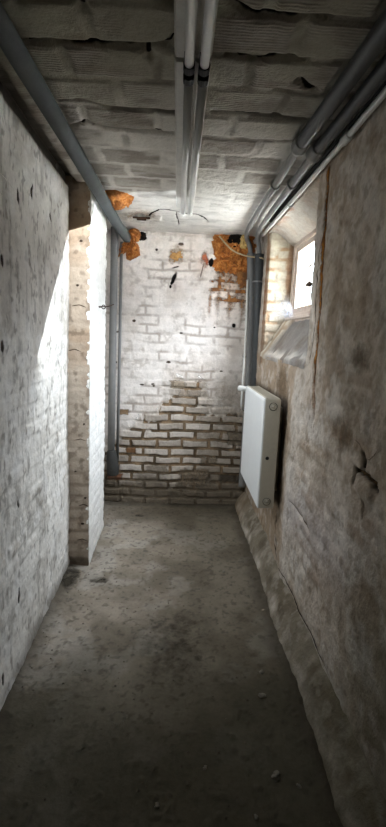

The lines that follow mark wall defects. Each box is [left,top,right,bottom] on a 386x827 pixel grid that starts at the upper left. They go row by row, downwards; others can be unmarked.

crack [310,224,327,375]
spalling [104,374,245,492]
spalling [357,449,379,493]
crack [274,501,328,673]